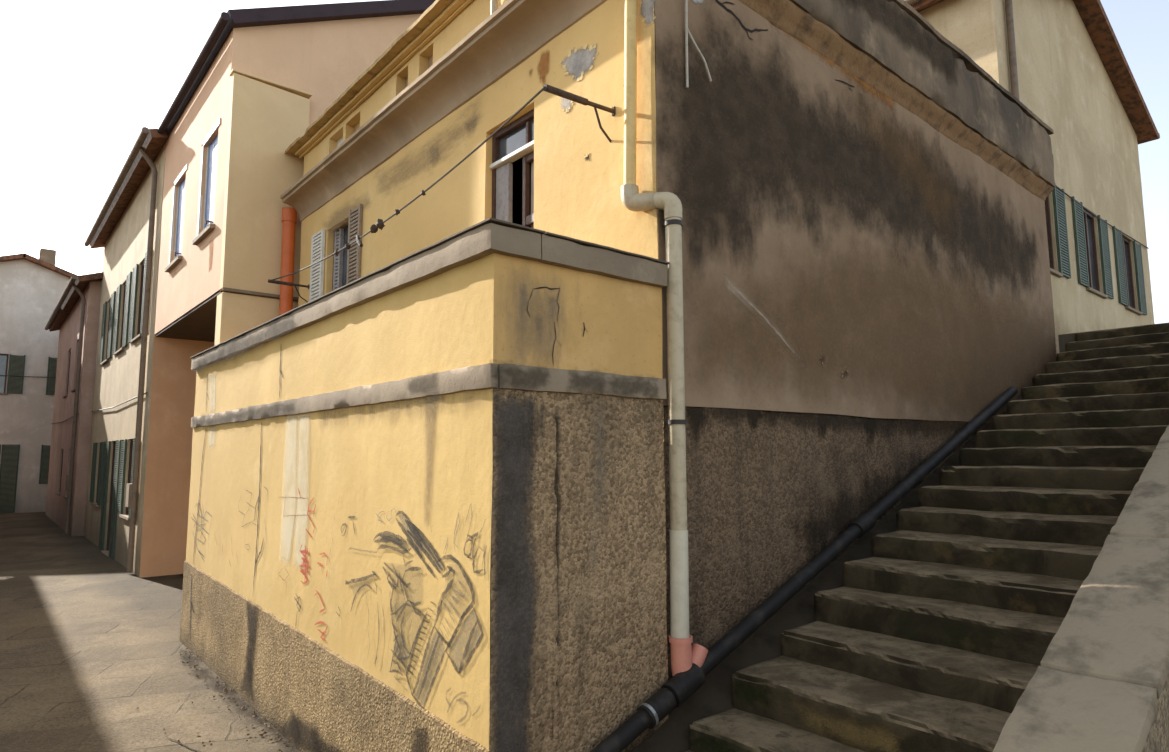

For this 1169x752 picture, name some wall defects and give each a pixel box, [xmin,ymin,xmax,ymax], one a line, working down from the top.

peeling [560,44,599,82]
peeling [640,0,656,24]
water stain [851,0,957,78]
peeling [561,97,574,113]
water stain [658,29,1036,287]
crack [527,287,588,365]
crack [253,423,263,589]
water stain [182,604,338,752]
water stain [414,730,427,752]